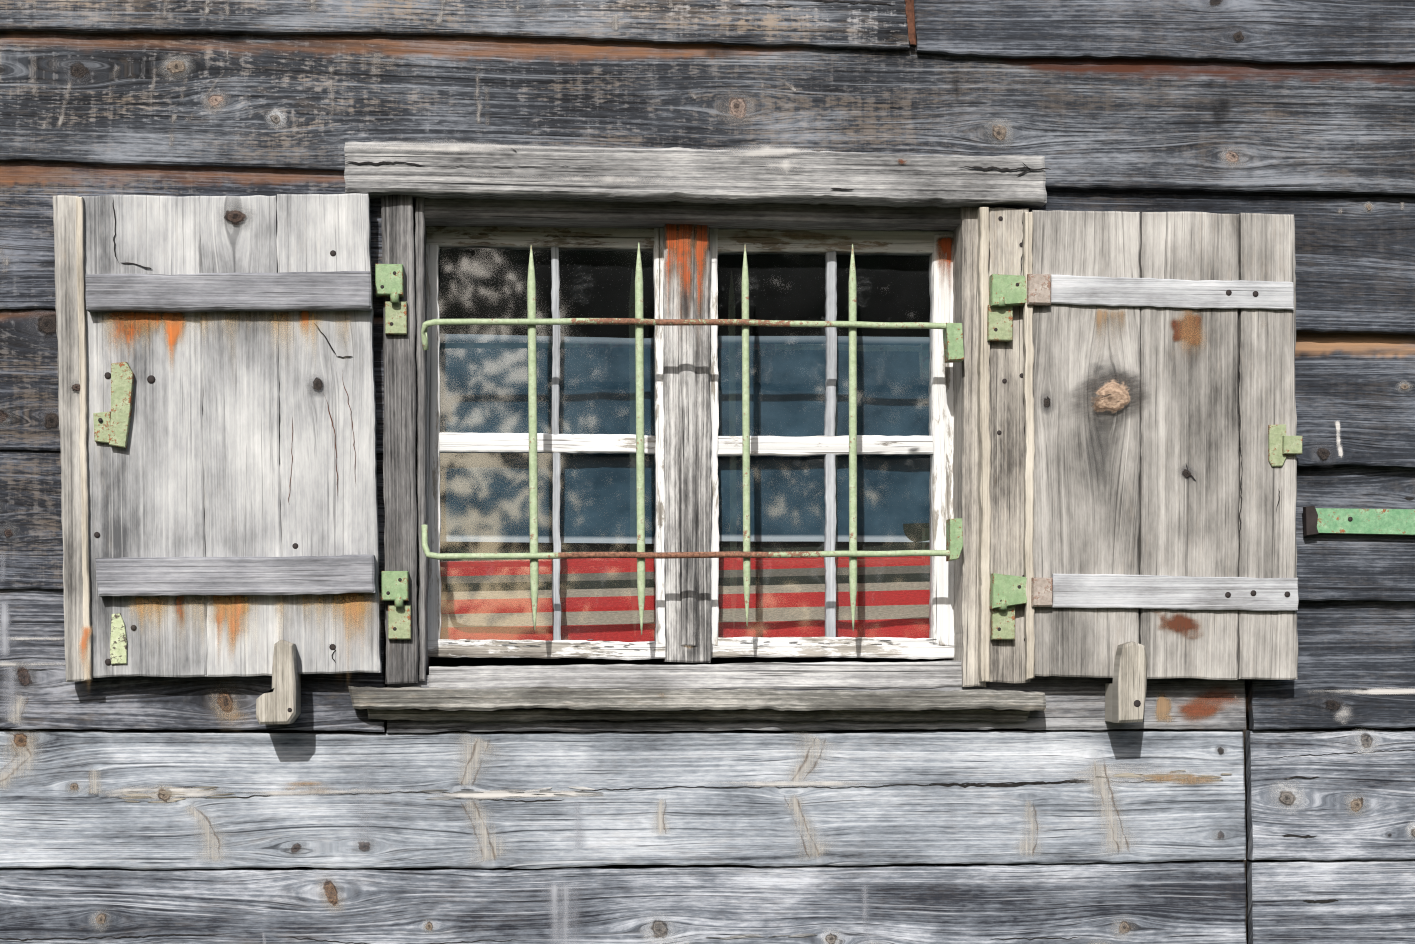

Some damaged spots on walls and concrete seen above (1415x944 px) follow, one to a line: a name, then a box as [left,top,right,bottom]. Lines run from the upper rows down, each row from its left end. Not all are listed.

crack [112,197,153,270]
corrosion [665,224,707,307]
corrosion [108,312,184,354]
corrosion [1171,315,1201,344]
corrosion [134,596,184,620]
corrosion [213,595,249,639]
corrosion [303,593,364,622]
corrosion [1161,614,1199,635]